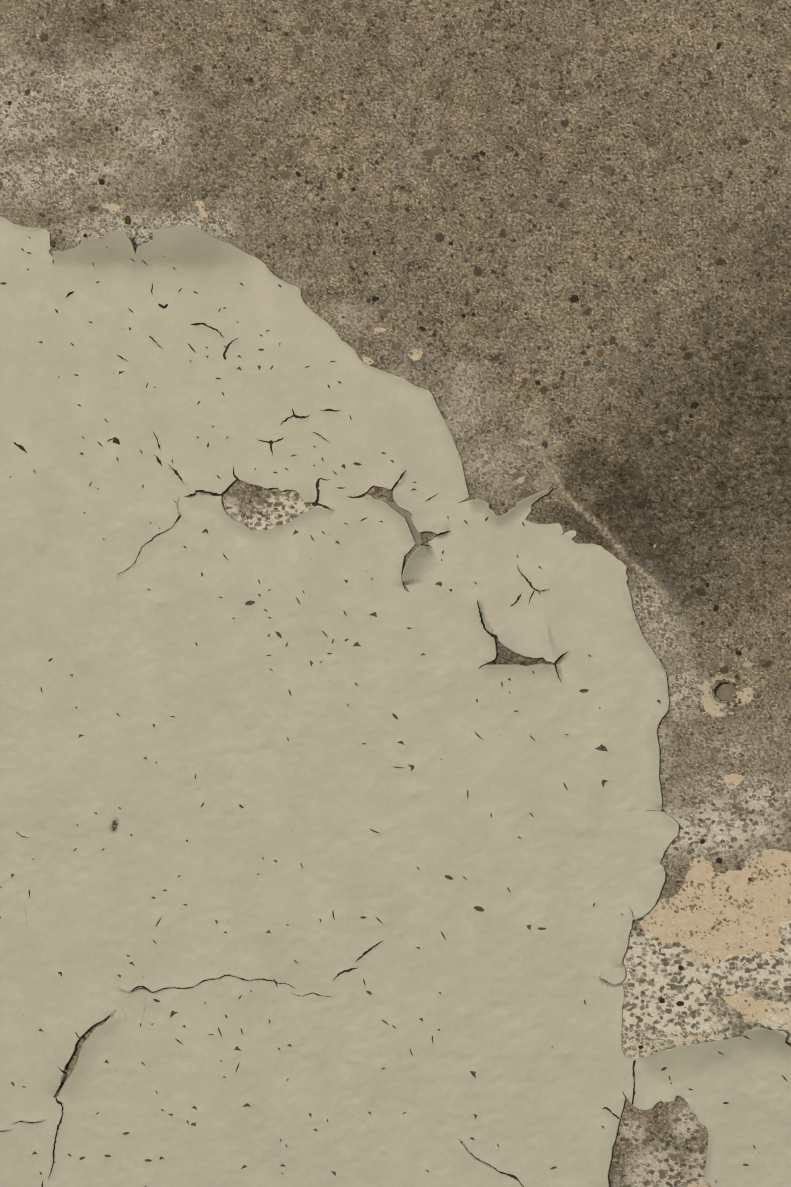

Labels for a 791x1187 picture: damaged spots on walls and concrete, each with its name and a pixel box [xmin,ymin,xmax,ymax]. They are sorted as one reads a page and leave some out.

peeling [52,225,267,268]
crack [106,431,191,581]
peeling [185,463,334,542]
peeling [347,467,451,592]
peeling [470,487,553,528]
peeling [469,599,568,681]
peeling [610,568,679,969]
crack [112,938,384,1024]
peeling [42,1002,122,1097]
peeling [594,1085,711,1187]